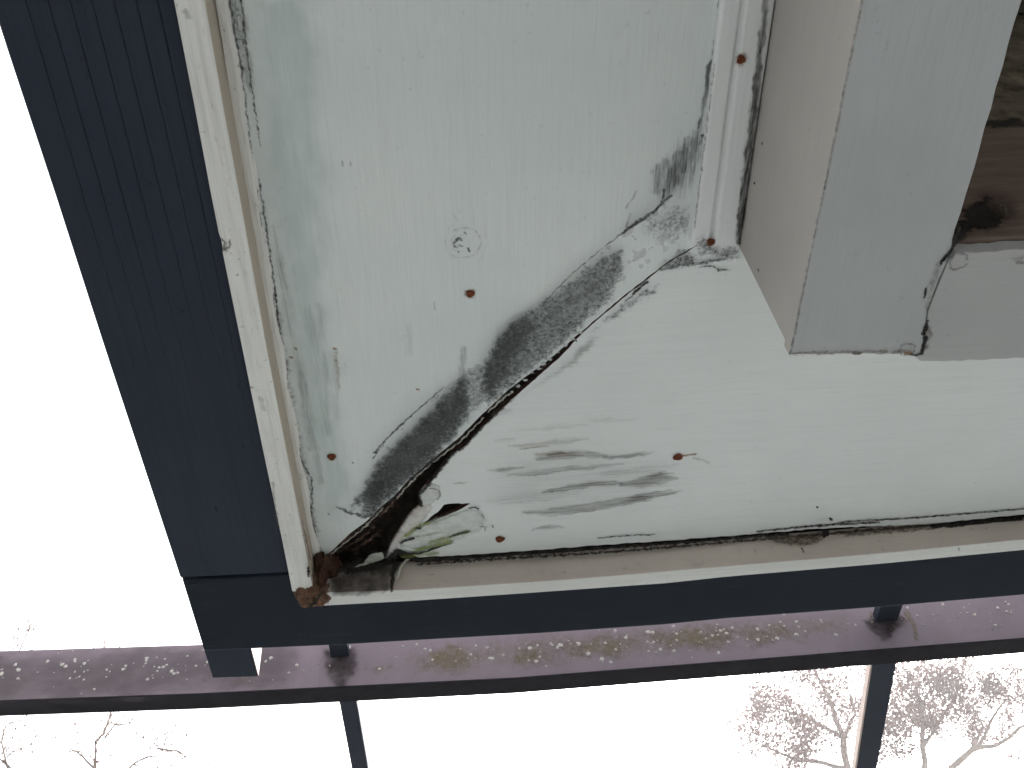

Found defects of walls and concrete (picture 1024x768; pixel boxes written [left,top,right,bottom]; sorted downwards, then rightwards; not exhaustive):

damp [659,0,767,272]
peeling [356,484,494,580]
peeling [397,331,582,499]
damp [336,250,655,519]
crack [549,189,672,298]
crack [328,340,1024,565]
crack [904,288,929,356]
crack [940,225,962,265]